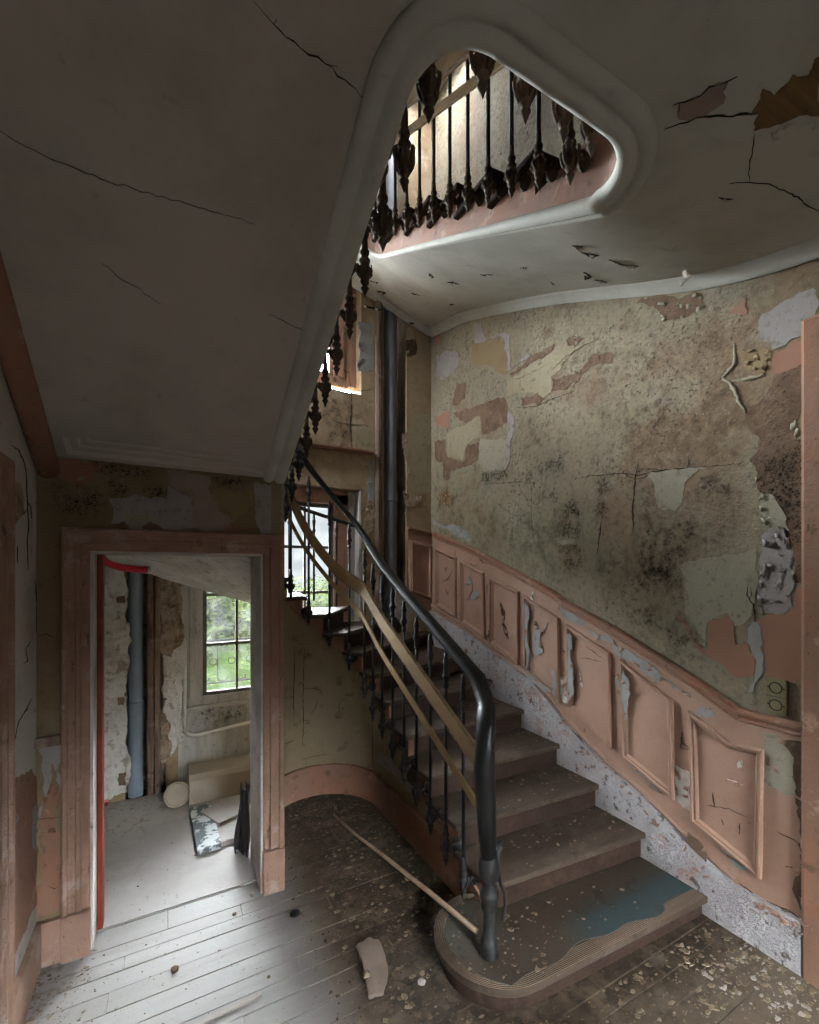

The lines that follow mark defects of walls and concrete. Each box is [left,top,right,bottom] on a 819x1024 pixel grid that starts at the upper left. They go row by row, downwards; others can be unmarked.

crack [1,131,252,224]
crack [254,2,363,98]
crack [664,76,819,212]
flaking render [752,56,819,131]
peeling [402,322,613,514]
crack [581,459,733,527]
flaking render [678,288,819,693]
peeling [159,578,185,771]
peeling [550,606,715,722]
peeling [15,744,61,954]
crack [708,792,749,835]
peeling [750,732,813,935]